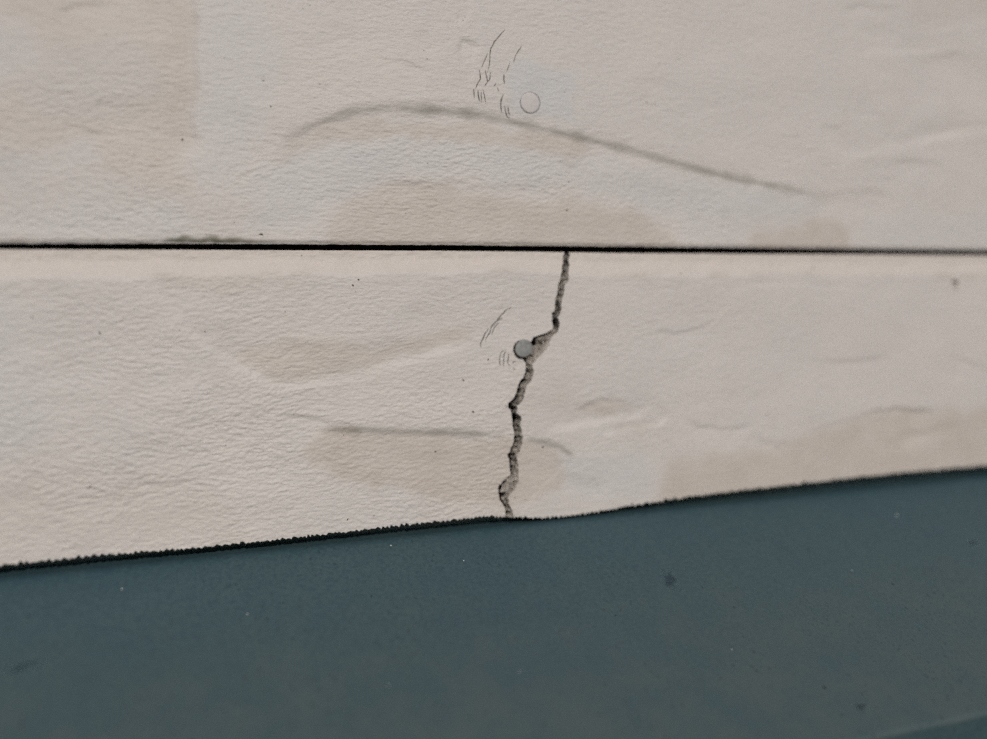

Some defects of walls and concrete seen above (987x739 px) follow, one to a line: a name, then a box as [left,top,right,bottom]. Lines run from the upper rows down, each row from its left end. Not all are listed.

crack [480,252,570,518]